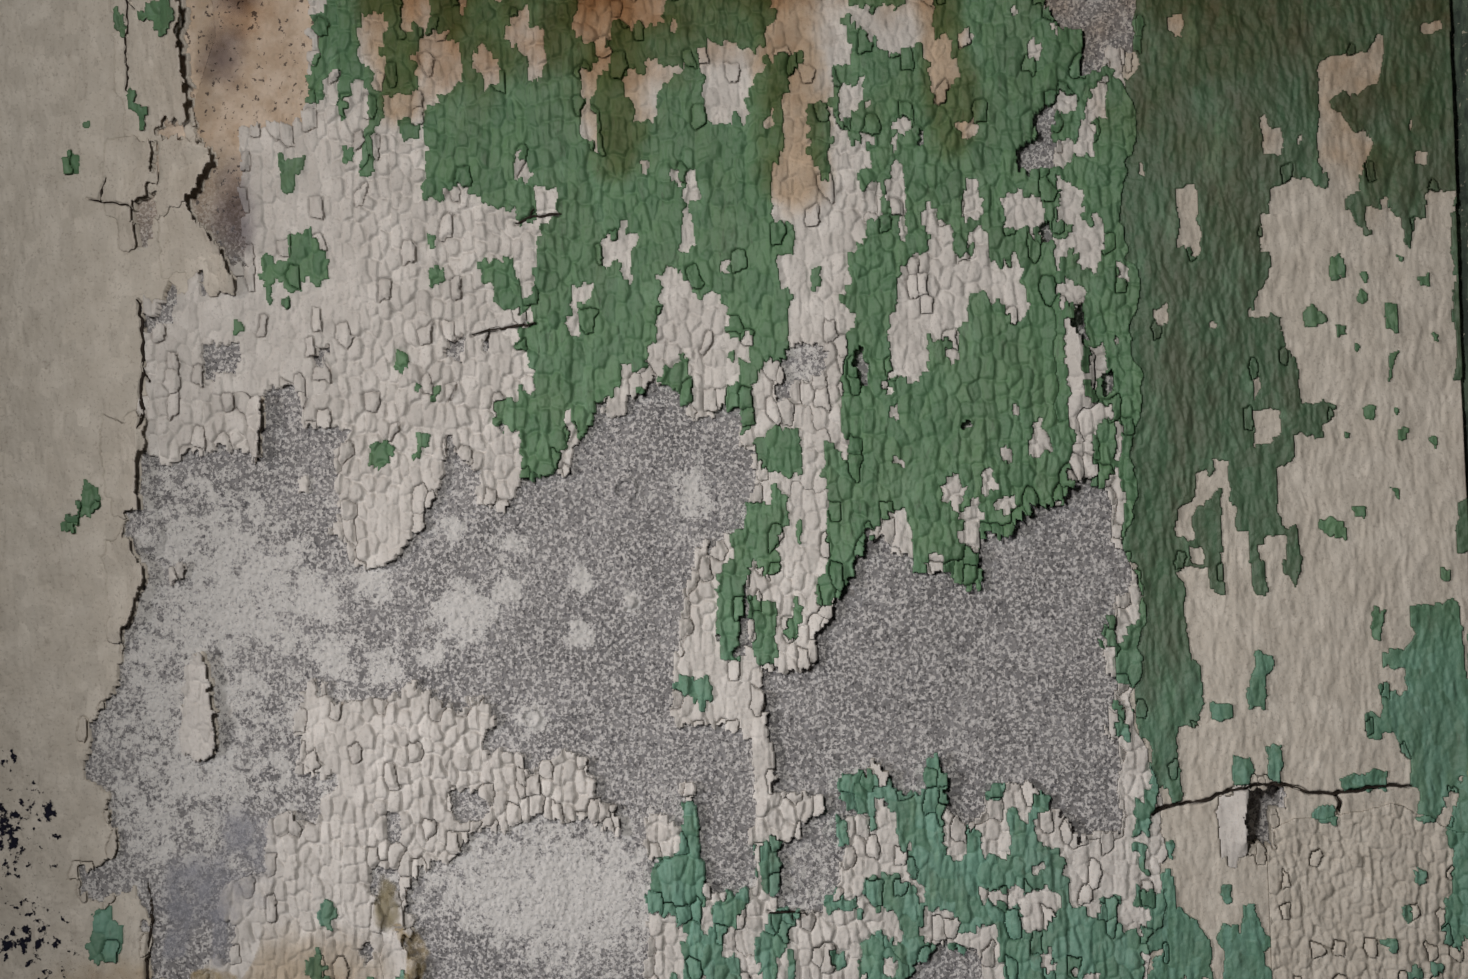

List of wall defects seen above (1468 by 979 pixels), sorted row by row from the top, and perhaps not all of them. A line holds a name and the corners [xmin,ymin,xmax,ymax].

peeling [61,150,73,174]
peeling [258,226,330,305]
peeling [64,500,100,533]
peeling [714,483,790,666]
peeling [204,677,622,979]
crack [1151,782,1412,815]
spalling [367,783,763,979]
crack [145,882,155,979]